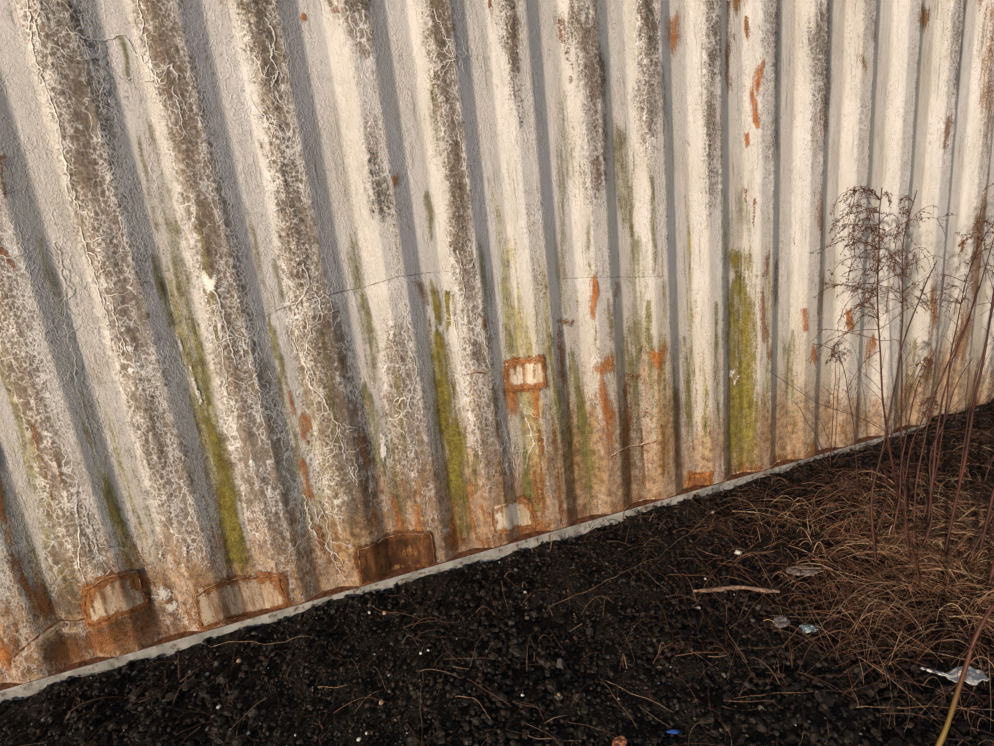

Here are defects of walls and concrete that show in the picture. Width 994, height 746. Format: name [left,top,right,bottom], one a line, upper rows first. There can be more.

corrosion [725,0,751,91]
water stain [136,0,258,445]
water stain [236,0,386,535]
water stain [367,144,393,223]
water stain [430,280,457,331]
water stain [421,0,475,291]
corrosion [590,275,600,319]
water stain [729,249,753,274]
corrosion [744,61,765,147]
corrosion [352,317,574,594]
corrosion [593,354,646,498]
corrosion [40,568,297,672]